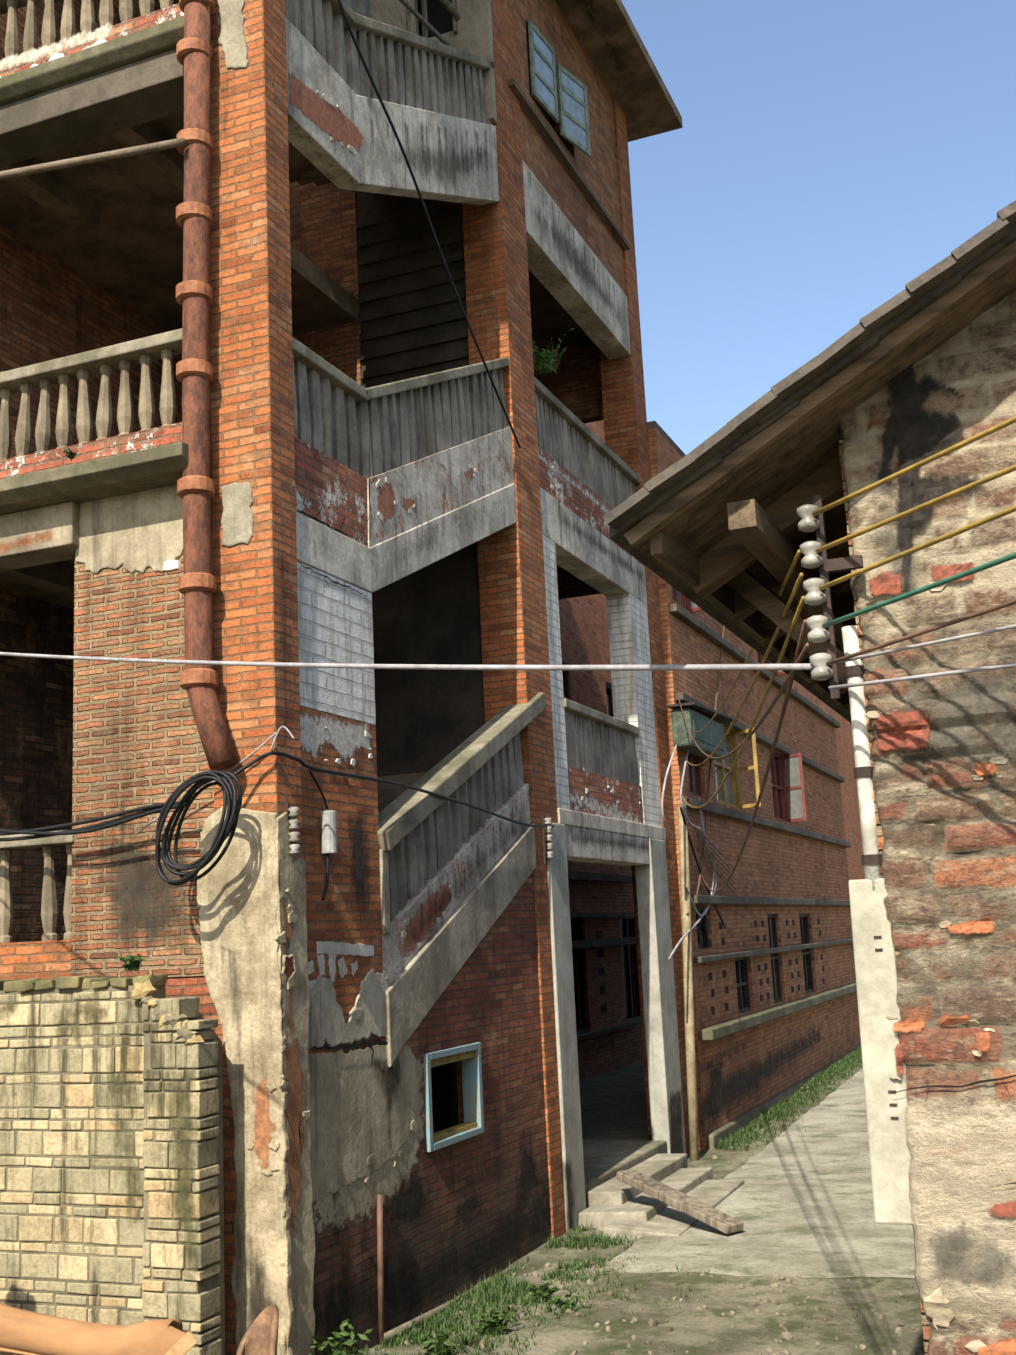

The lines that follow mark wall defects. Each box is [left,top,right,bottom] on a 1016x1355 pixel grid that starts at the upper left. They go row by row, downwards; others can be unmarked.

peeling [289,74,364,155]
damp [923,375,963,397]
peeling [376,477,416,522]
peeling [538,450,610,526]
damp [878,418,914,593]
peeling [300,713,373,767]
spalling [964,1338,1016,1355]